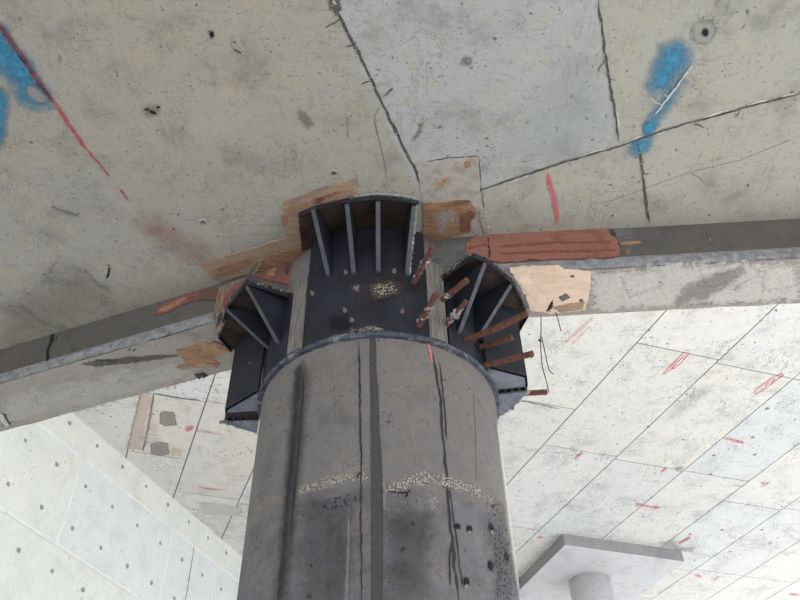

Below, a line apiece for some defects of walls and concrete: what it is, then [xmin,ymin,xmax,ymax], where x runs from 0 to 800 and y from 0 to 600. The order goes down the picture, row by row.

crack [326,0,800,223]
peeling [281,189,353,226]
peeling [460,211,475,233]
peeling [153,258,253,316]
peeling [175,341,233,370]
crack [355,342,363,598]
crack [433,354,464,600]